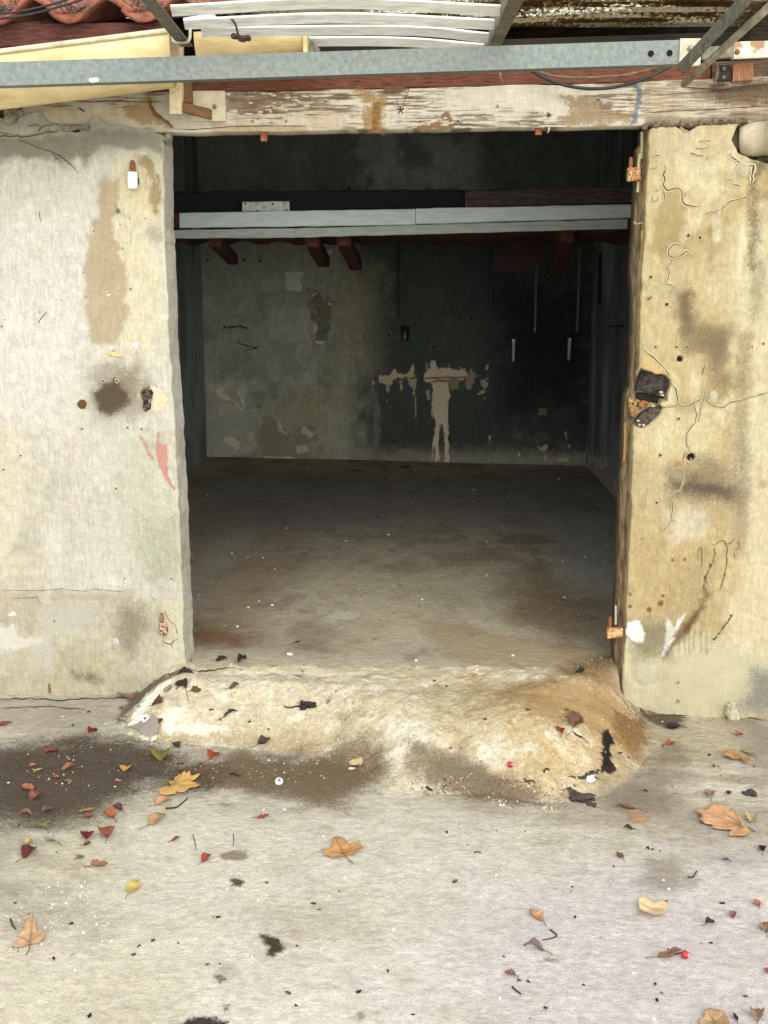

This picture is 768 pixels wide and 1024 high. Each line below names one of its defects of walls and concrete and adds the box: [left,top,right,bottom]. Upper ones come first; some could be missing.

rust [353,88,386,132]
crack [646,89,760,214]
crack [665,239,693,288]
water stain [95,380,129,414]
spalling [626,355,674,433]
crack [642,349,768,533]
water stain [0,734,387,829]